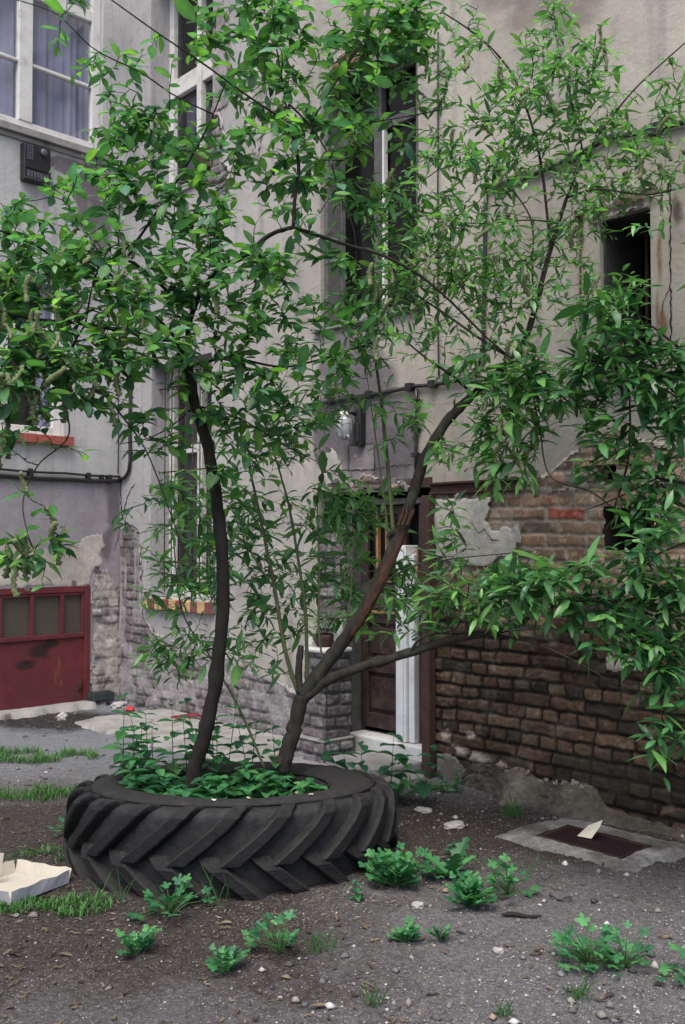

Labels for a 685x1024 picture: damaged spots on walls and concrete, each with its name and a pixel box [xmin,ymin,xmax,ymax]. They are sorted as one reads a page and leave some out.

peeling [434,493,522,567]
flaking render [0,524,212,716]
flaking render [216,655,296,736]